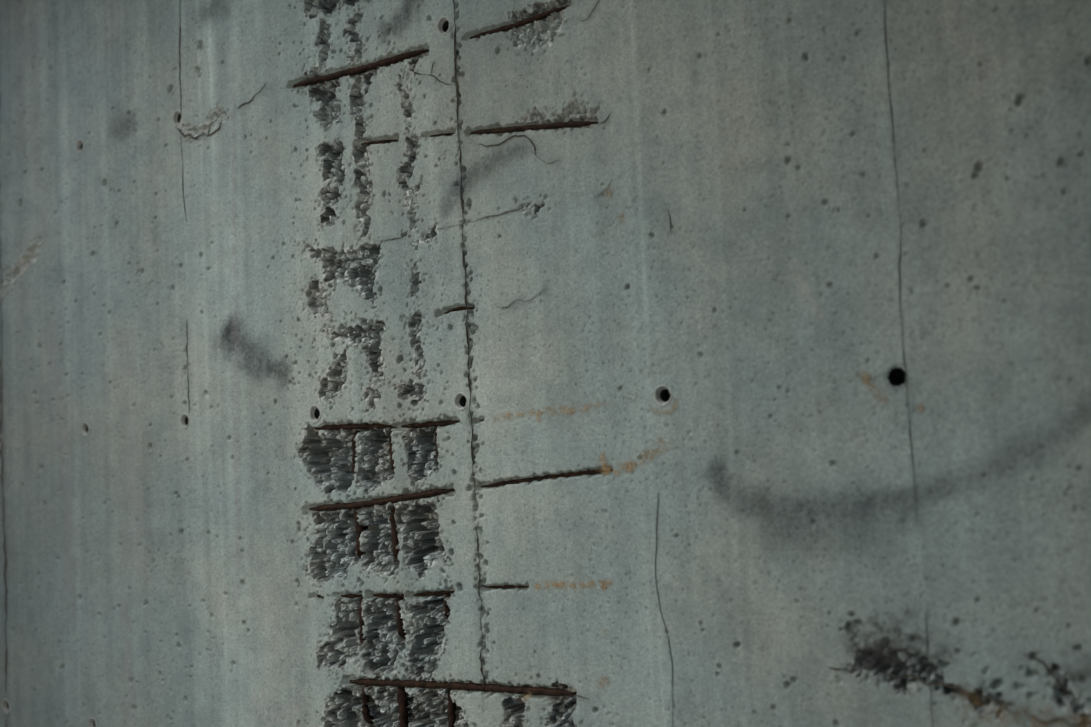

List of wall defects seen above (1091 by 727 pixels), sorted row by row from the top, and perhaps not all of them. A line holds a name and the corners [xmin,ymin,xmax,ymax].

crack [177,9,264,217]
corrosion [293,49,429,88]
spalling [504,0,572,55]
spalling [297,0,451,586]
crack [411,0,557,691]
crack [0,240,8,687]
corrosion [309,488,455,559]
corrosion [314,420,460,474]
spalling [314,589,470,727]
corrosion [349,678,577,727]
spalling [543,681,578,727]
crack [655,494,673,727]